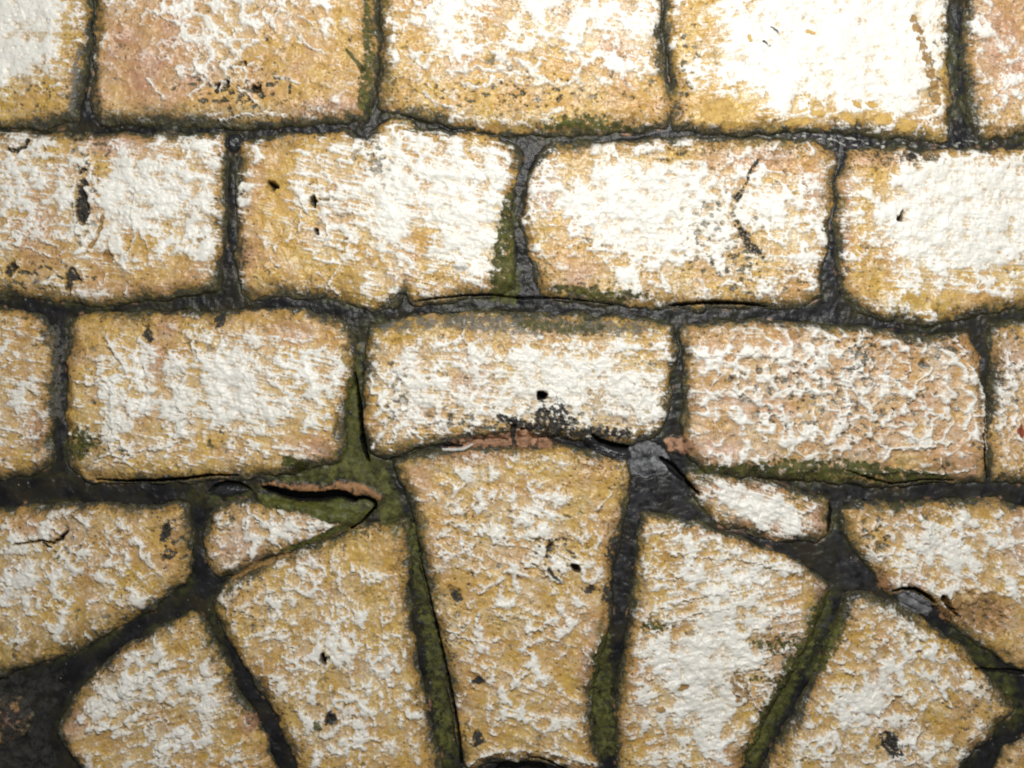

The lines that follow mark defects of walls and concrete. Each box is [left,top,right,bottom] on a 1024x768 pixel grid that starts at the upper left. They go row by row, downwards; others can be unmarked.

crack [415,294,610,305]
crack [670,300,763,308]
spalling [442,424,557,451]
damp [281,455,308,468]
crack [101,474,382,528]
damp [280,505,377,553]
crack [895,587,954,611]
damp [640,621,668,633]
damp [749,636,798,655]
damp [812,614,846,677]